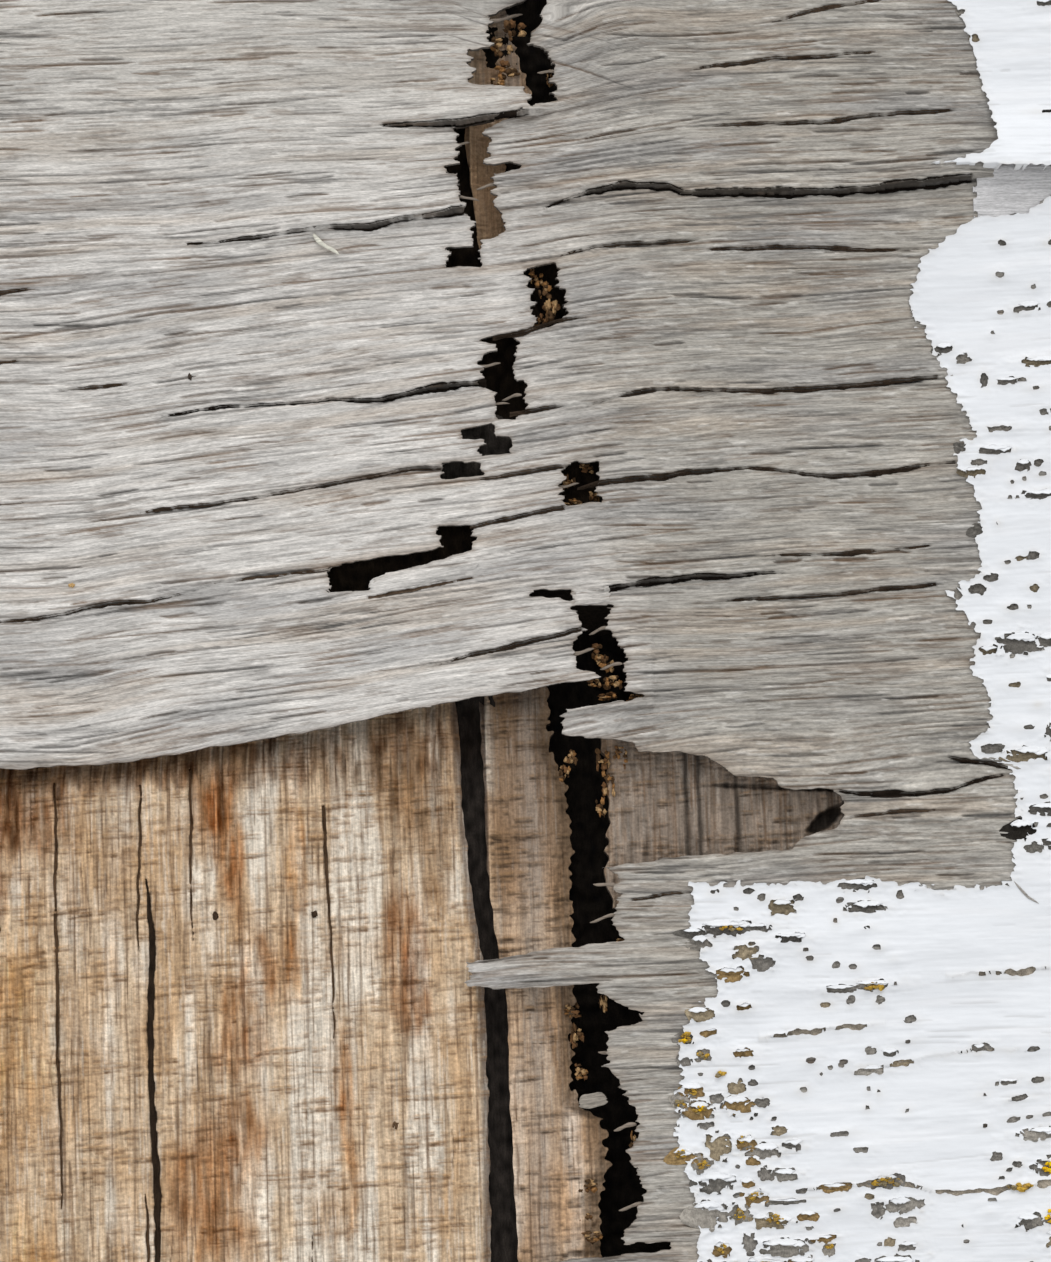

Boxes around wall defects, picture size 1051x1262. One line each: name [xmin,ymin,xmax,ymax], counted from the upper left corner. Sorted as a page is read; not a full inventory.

crack [187,0,557,268]
crack [146,239,955,601]
peeling [953,425,1044,478]
peeling [978,632,1051,655]
crack [136,785,162,1262]
crack [455,696,518,1262]
crack [441,626,689,947]
crack [568,983,672,1257]
peeling [671,1000,754,1069]
peeling [673,888,806,983]
peeling [663,1079,1012,1262]
peeling [999,794,1051,853]